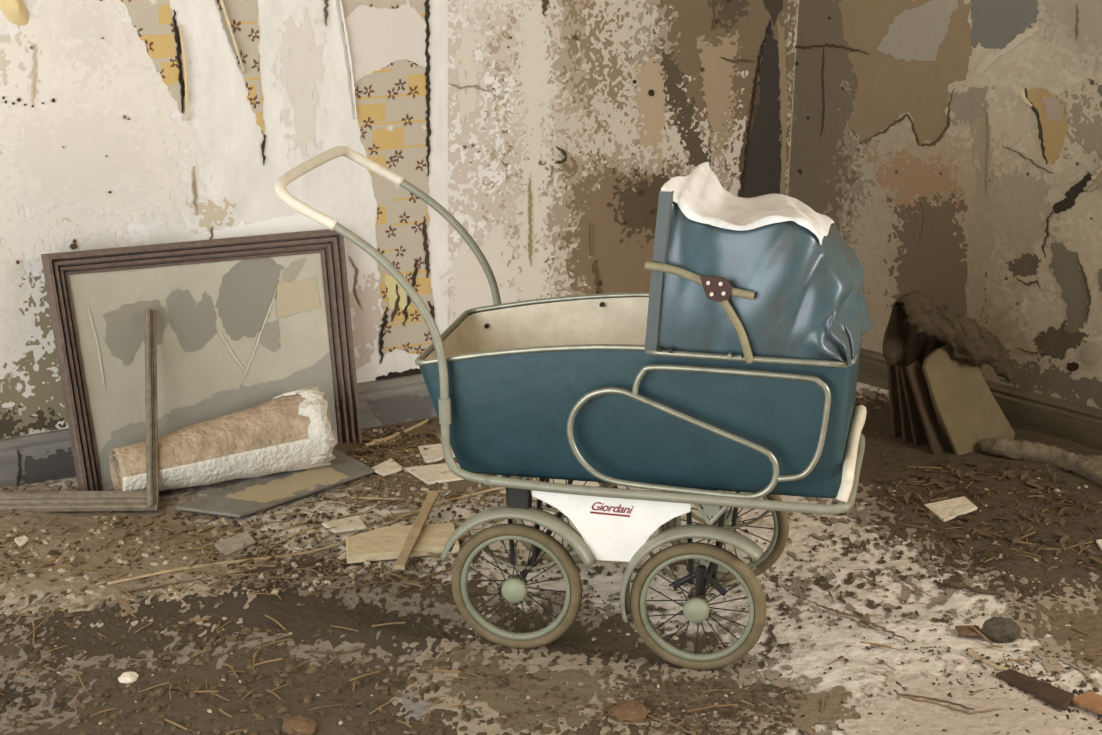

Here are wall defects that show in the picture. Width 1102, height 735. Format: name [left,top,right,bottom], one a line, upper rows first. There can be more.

water stain [440,0,1102,409]
spalling [828,0,1039,147]
spalling [1027,87,1068,165]
spalling [1053,162,1092,214]